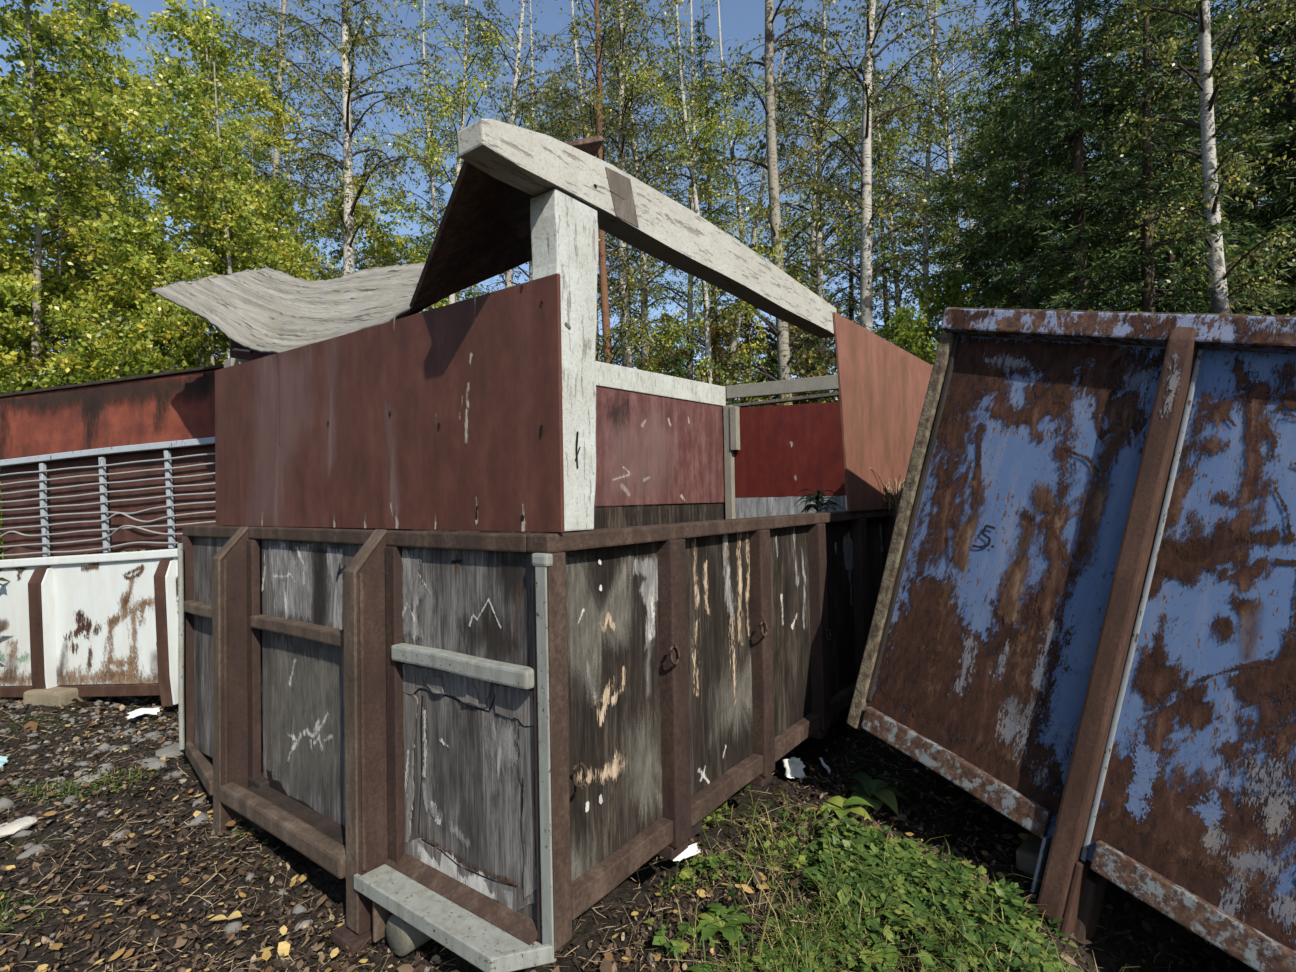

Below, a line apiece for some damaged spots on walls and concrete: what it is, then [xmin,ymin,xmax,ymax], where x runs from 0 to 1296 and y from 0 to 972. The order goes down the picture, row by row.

leakage [0,373,212,450]
corrosion [0,621,32,685]
corrosion [56,564,159,685]
leakage [566,555,632,700]
peeling [948,635,1019,696]
corrosion [867,309,1178,827]
peeling [995,615,1092,790]
corrosion [1090,317,1296,951]
leakage [625,720,662,813]
peeling [1124,743,1161,824]
leakage [571,844,596,882]
peeling [1187,746,1296,952]